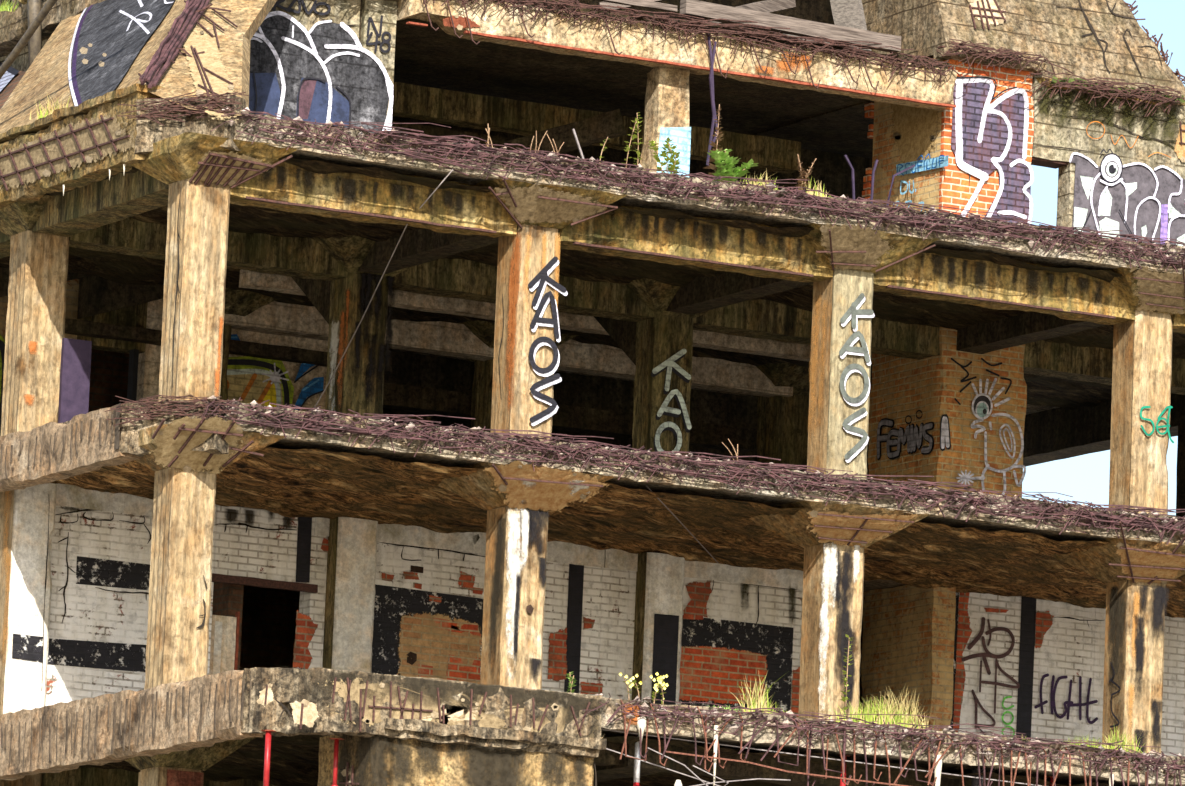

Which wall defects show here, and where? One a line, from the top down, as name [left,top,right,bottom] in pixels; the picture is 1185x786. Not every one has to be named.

damp [262,166,414,204]
damp [921,253,1102,300]
peeling [381,565,442,603]
damp [294,503,605,737]
peeling [458,571,483,595]
peeling [683,580,712,620]
damp [819,543,860,711]
damp [1109,585,1169,721]
spalling [290,593,1185,778]
damp [1135,699,1163,753]
damp [337,726,529,786]
damp [542,752,585,786]